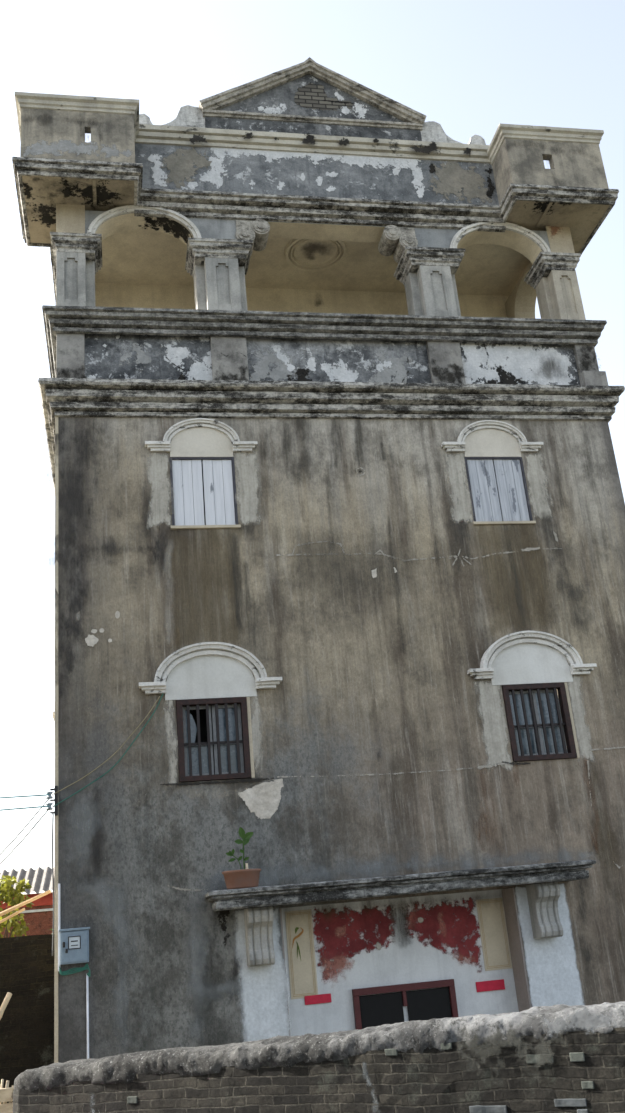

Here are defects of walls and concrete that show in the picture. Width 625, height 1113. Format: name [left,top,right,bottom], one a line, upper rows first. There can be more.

peeling [147,147,495,203]
peeling [102,335,213,380]
peeling [249,344,412,383]
peeling [460,342,578,385]
water stain [283,418,308,476]
water stain [47,424,94,566]
water stain [144,501,249,646]
crack [277,541,562,567]
spalling [238,779,284,819]
water stain [191,910,230,991]
peeling [312,897,481,980]
crack [362,1062,380,1113]